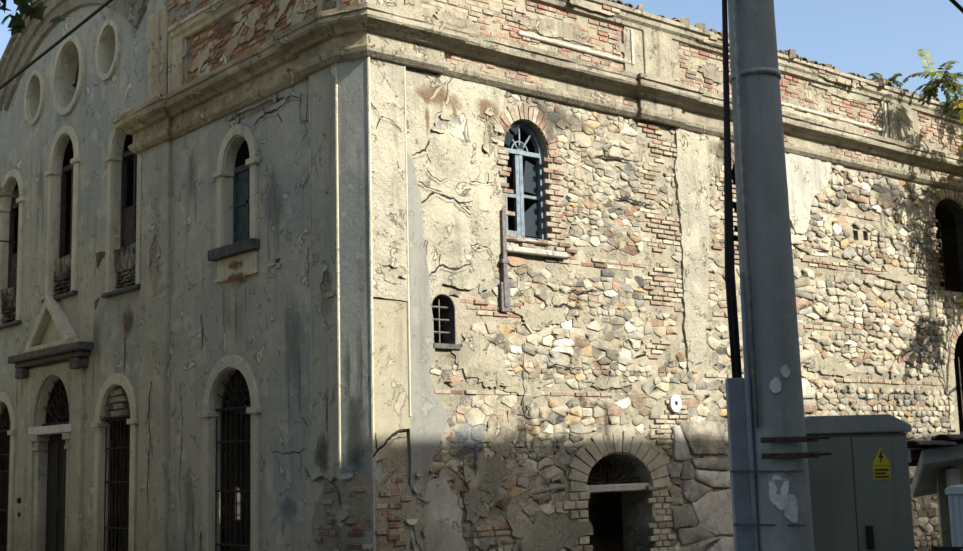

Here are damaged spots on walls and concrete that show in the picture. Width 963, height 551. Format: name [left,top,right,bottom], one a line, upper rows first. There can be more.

flaking render [164,0,364,83]
crack [253,94,309,131]
crack [371,103,402,132]
flaking render [431,112,464,147]
crack [412,77,496,218]
crack [423,213,498,280]
water stain [347,347,362,462]
water stain [316,437,327,470]
crack [371,429,406,461]
flaking render [312,467,433,551]